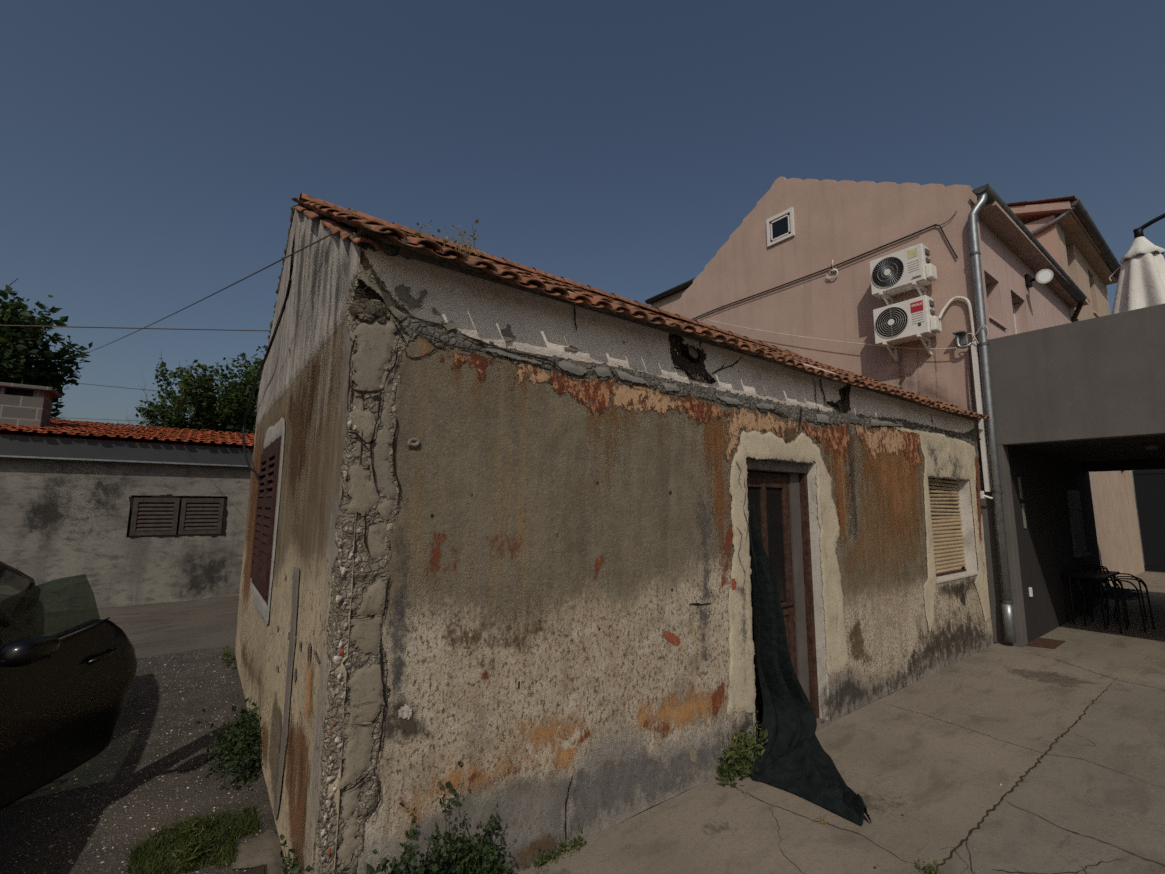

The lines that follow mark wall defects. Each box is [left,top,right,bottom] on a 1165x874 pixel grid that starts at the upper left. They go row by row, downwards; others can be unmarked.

water stain [295,232,336,341]
water stain [28,479,63,531]
corrosion [822,426,924,542]
water stain [183,556,226,594]
spalling [294,262,980,874]
corrosion [850,618,872,665]
water stain [817,577,988,724]
corrosion [285,660,312,861]
corrosion [637,683,727,737]